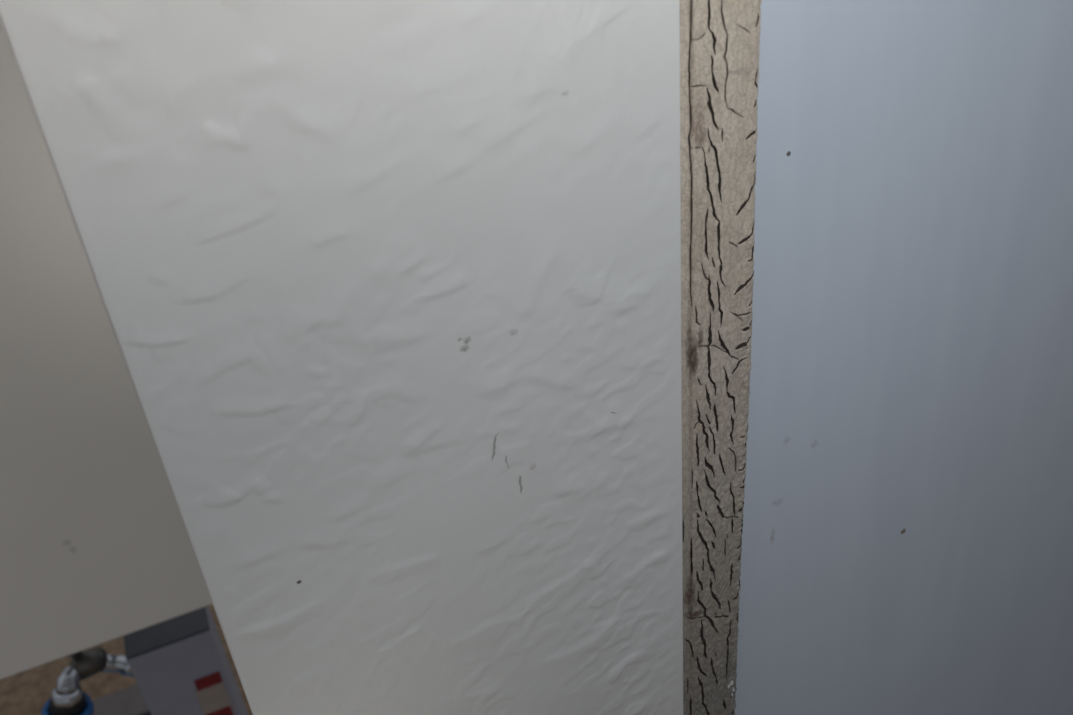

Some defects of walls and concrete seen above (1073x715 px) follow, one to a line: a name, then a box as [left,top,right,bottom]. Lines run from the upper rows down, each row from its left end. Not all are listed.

crack [682,0,759,715]